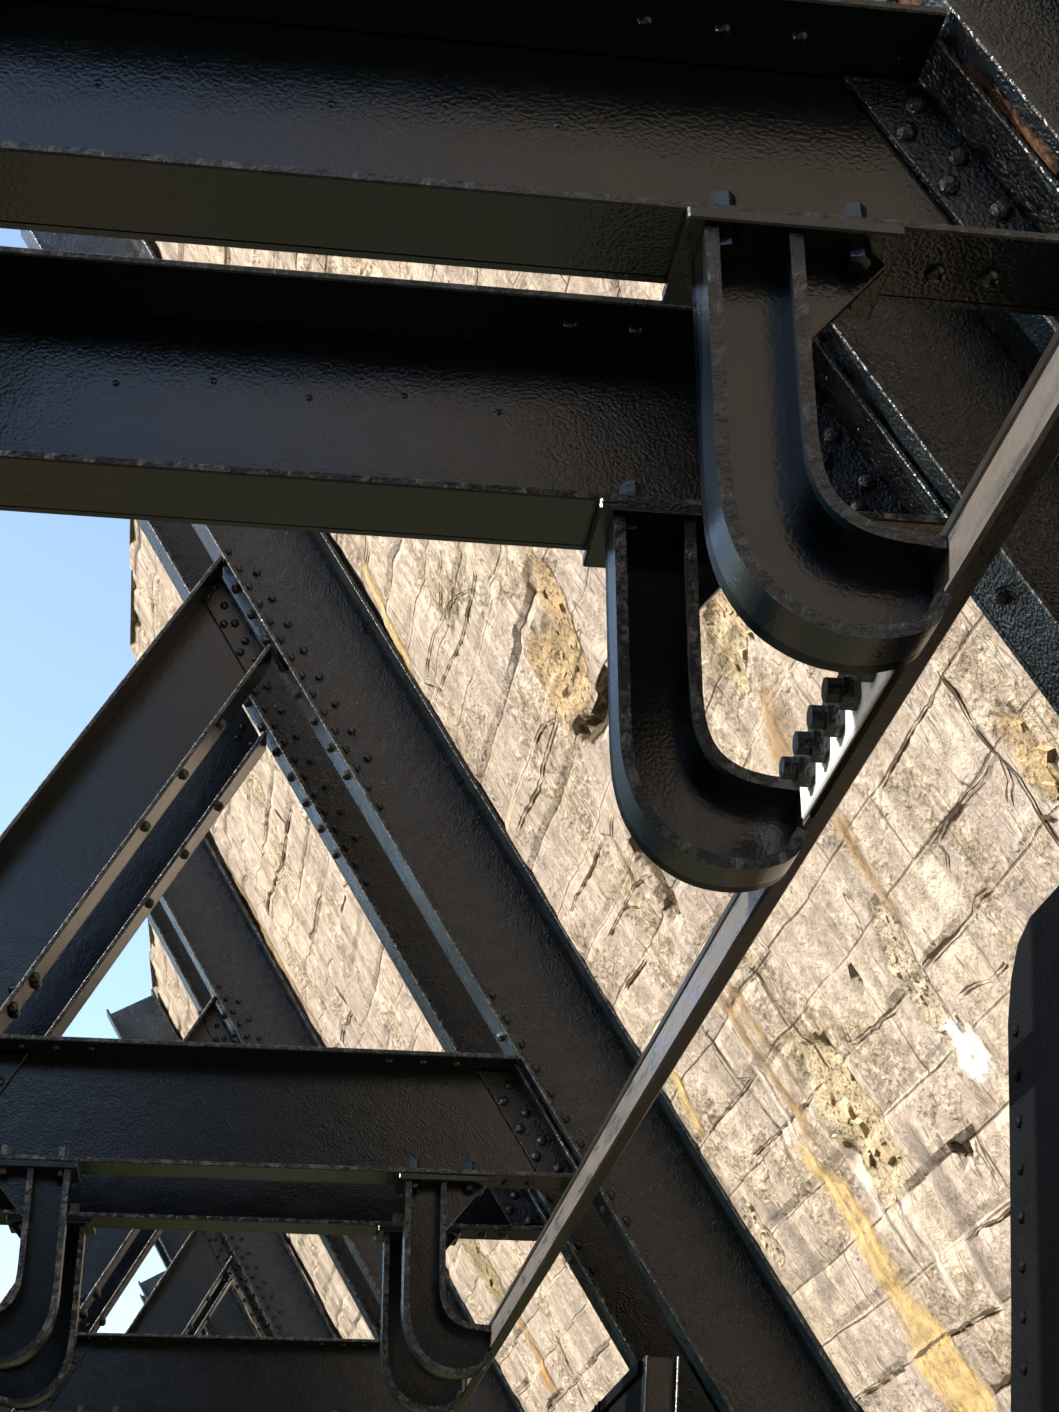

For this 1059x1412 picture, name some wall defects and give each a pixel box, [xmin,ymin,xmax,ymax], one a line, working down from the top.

corrosion [963,62,1052,171]
spalling [520,550,609,742]
crack [879,671,1059,869]
crack [922,888,987,966]
crack [956,961,1005,997]
crack [700,964,891,1173]
crack [965,1207,1010,1240]